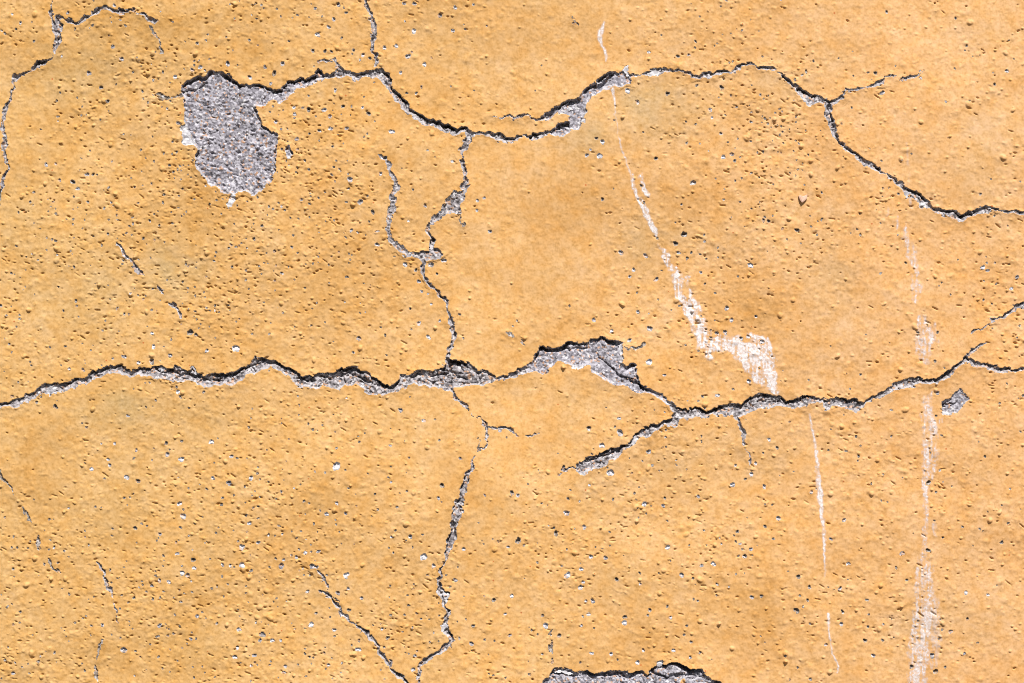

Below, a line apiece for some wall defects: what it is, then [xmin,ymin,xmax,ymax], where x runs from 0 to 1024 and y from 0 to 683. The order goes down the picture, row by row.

spalling [10,1,433,335]
damp [629,170,657,237]
crack [629,62,1024,222]
crack [0,0,552,683]
spalling [526,329,671,413]
damp [661,249,779,394]
crack [557,302,1024,476]
damp [916,316,936,363]
spalling [935,388,970,417]
crack [547,629,555,664]
damp [909,553,935,683]